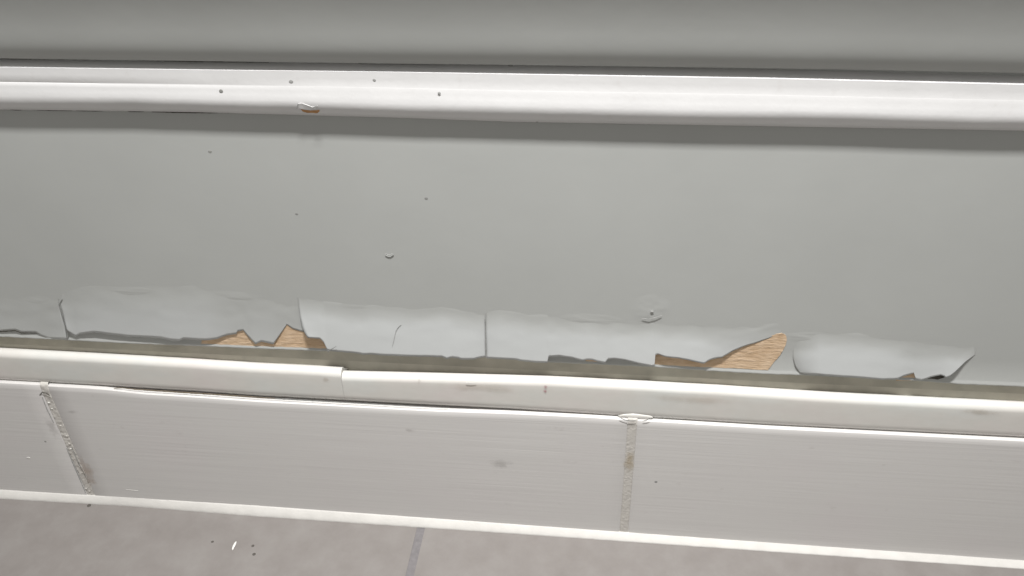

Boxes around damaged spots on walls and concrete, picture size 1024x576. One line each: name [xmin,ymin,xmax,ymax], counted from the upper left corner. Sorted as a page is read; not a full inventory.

peeling [0,285,975,381]